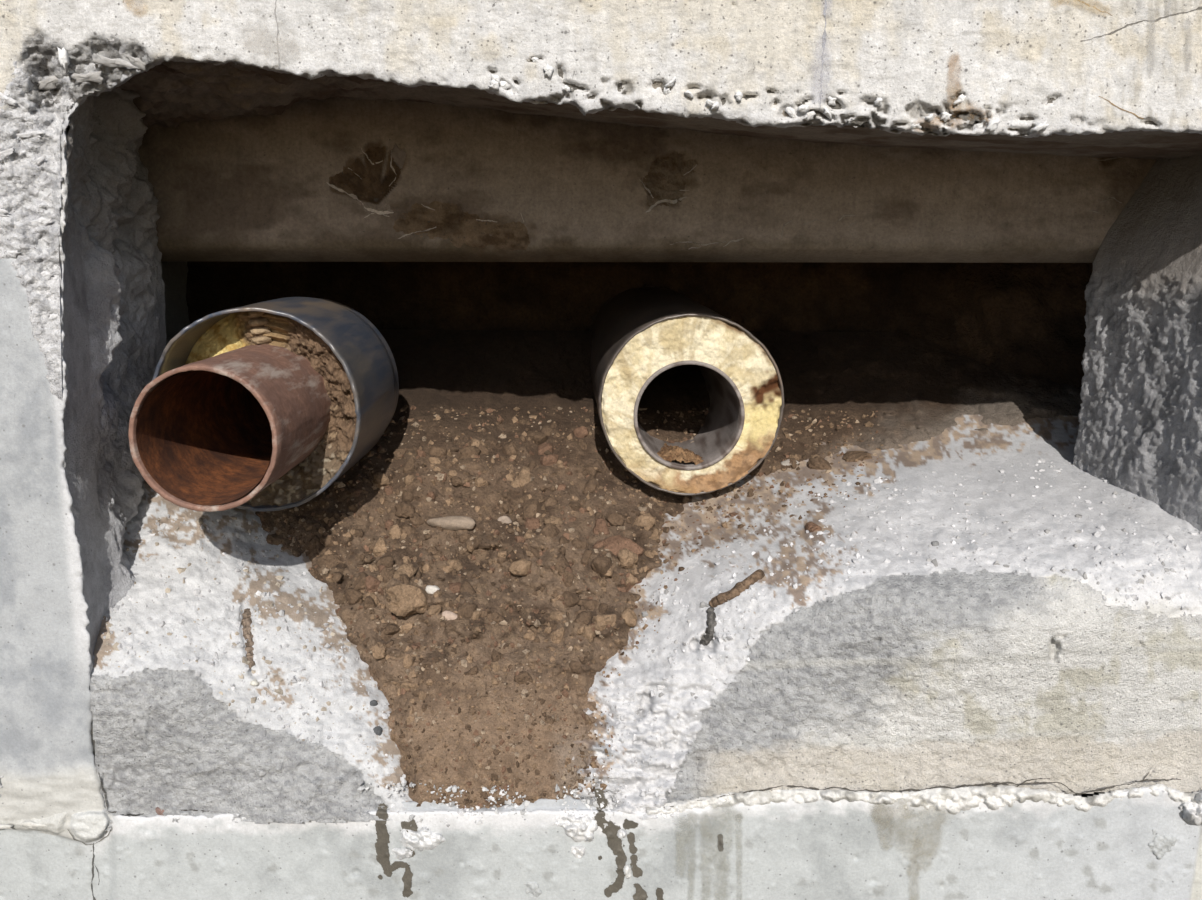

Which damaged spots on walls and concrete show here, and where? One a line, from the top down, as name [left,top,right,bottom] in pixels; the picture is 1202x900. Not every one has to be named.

crack [1077,0,1202,41]
crack [818,0,827,111]
spalling [488,70,519,90]
spalling [531,57,595,99]
spalling [652,77,843,122]
spalling [846,98,883,125]
spalling [892,94,1000,132]
spalling [1020,117,1049,133]
spalling [0,34,154,400]
spalling [326,143,530,251]
corrosion [699,569,765,646]
crack [664,773,1181,808]